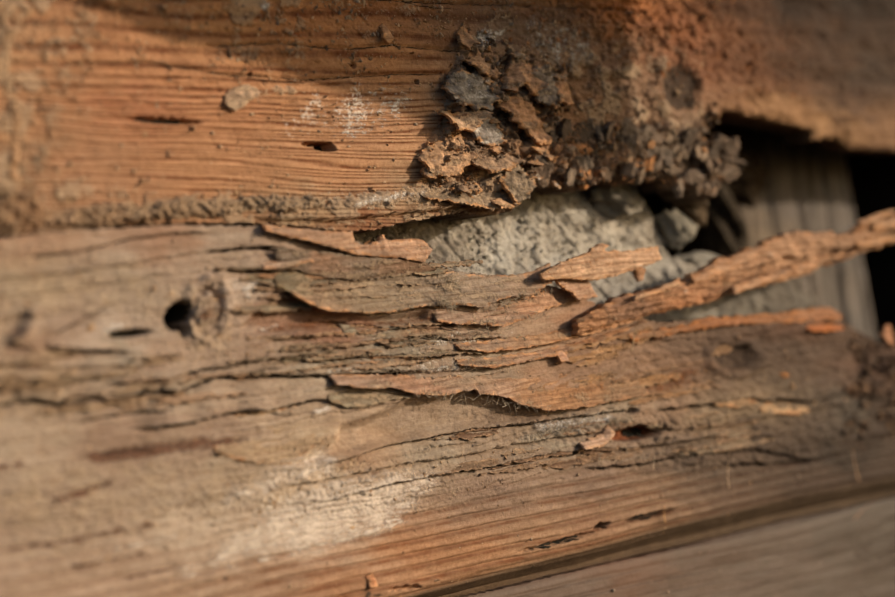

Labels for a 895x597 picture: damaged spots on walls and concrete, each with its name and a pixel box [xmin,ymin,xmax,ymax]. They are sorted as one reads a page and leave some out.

spalling [416,27,749,212]
crack [24,231,277,273]
crack [45,303,128,354]
crack [0,334,413,430]
crack [654,404,730,413]
crack [758,394,842,403]
crack [319,410,626,468]
crack [572,435,842,470]
crack [326,464,503,502]